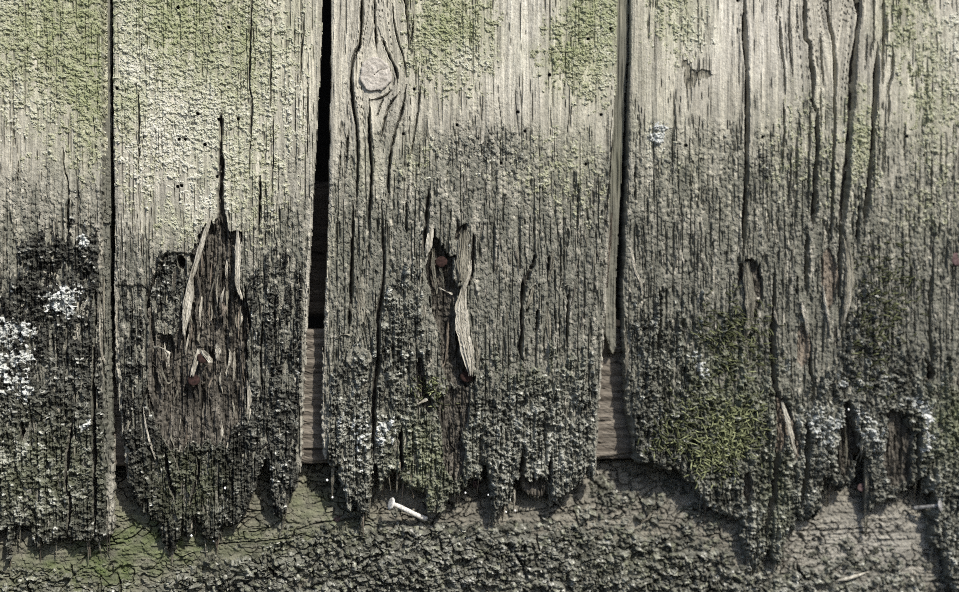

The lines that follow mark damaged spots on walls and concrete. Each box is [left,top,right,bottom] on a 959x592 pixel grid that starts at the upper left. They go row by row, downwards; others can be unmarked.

crack [218,116,226,223]
water stain [430,124,534,183]
crack [769,0,890,403]
crack [166,455,200,507]
crack [764,461,775,533]